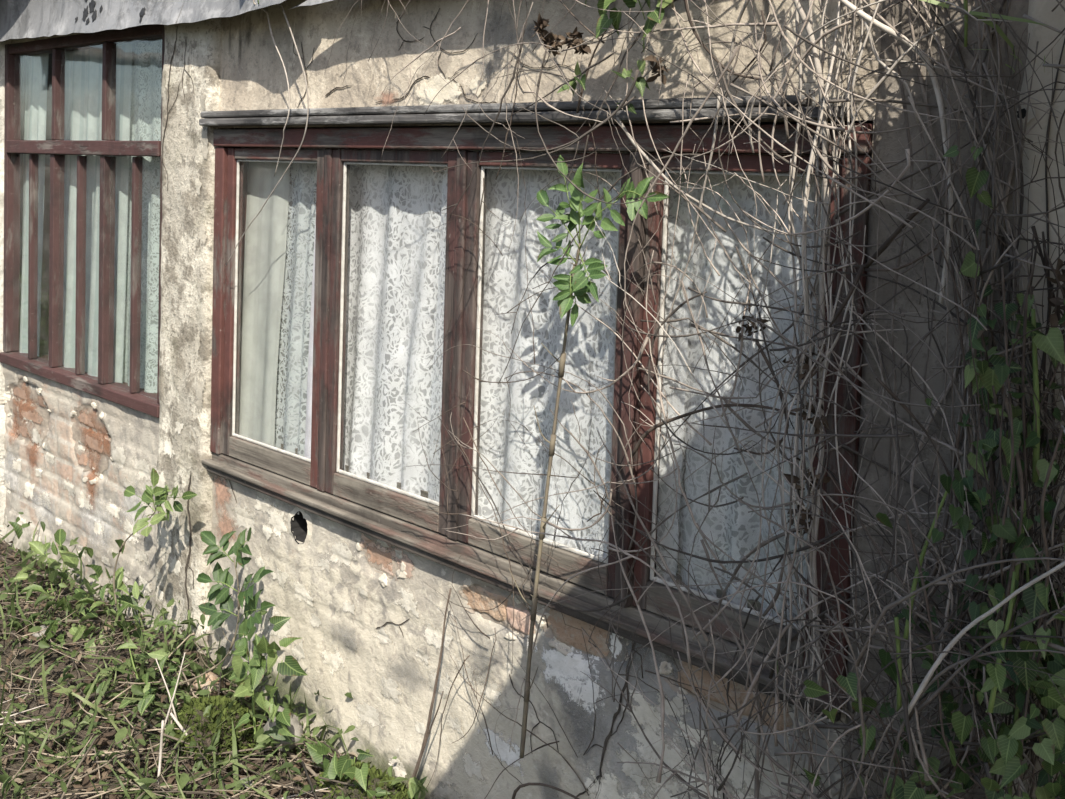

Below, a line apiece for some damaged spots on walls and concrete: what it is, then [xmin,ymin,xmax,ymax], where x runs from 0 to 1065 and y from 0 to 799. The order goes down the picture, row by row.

spalling [0,376,64,526]
peeling [163,422,192,459]
spalling [62,402,183,576]
peeling [0,514,41,542]
peeling [94,501,183,630]
peeling [267,610,305,661]
peeling [255,557,322,628]
peeling [317,533,503,709]
spalling [458,578,630,716]
peeling [388,758,407,778]
peeling [414,720,432,735]
peeling [478,728,525,776]